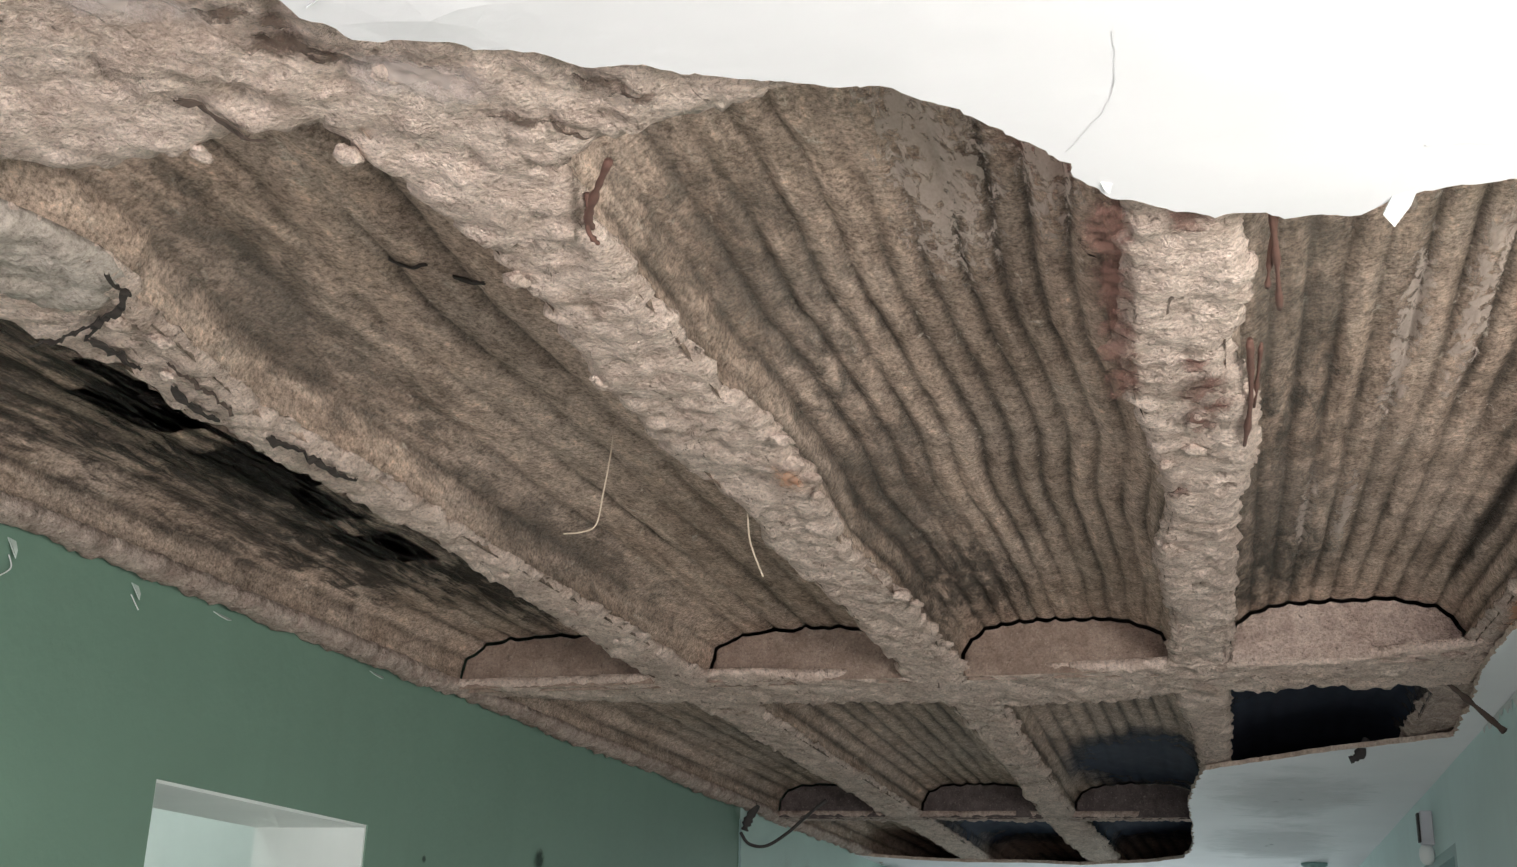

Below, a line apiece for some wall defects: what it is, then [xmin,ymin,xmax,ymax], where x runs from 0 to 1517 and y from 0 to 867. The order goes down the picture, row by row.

spalling [191,6,367,69]
spalling [571,73,657,107]
spalling [486,111,589,140]
spalling [583,157,613,246]
corrosion [1170,211,1211,233]
peeling [1383,189,1418,227]
spalling [1264,214,1283,311]
corrosion [1080,195,1140,399]
corrosion [1181,358,1231,433]
spalling [1243,337,1263,447]
spalling [1447,684,1517,734]
spalling [1348,737,1370,764]